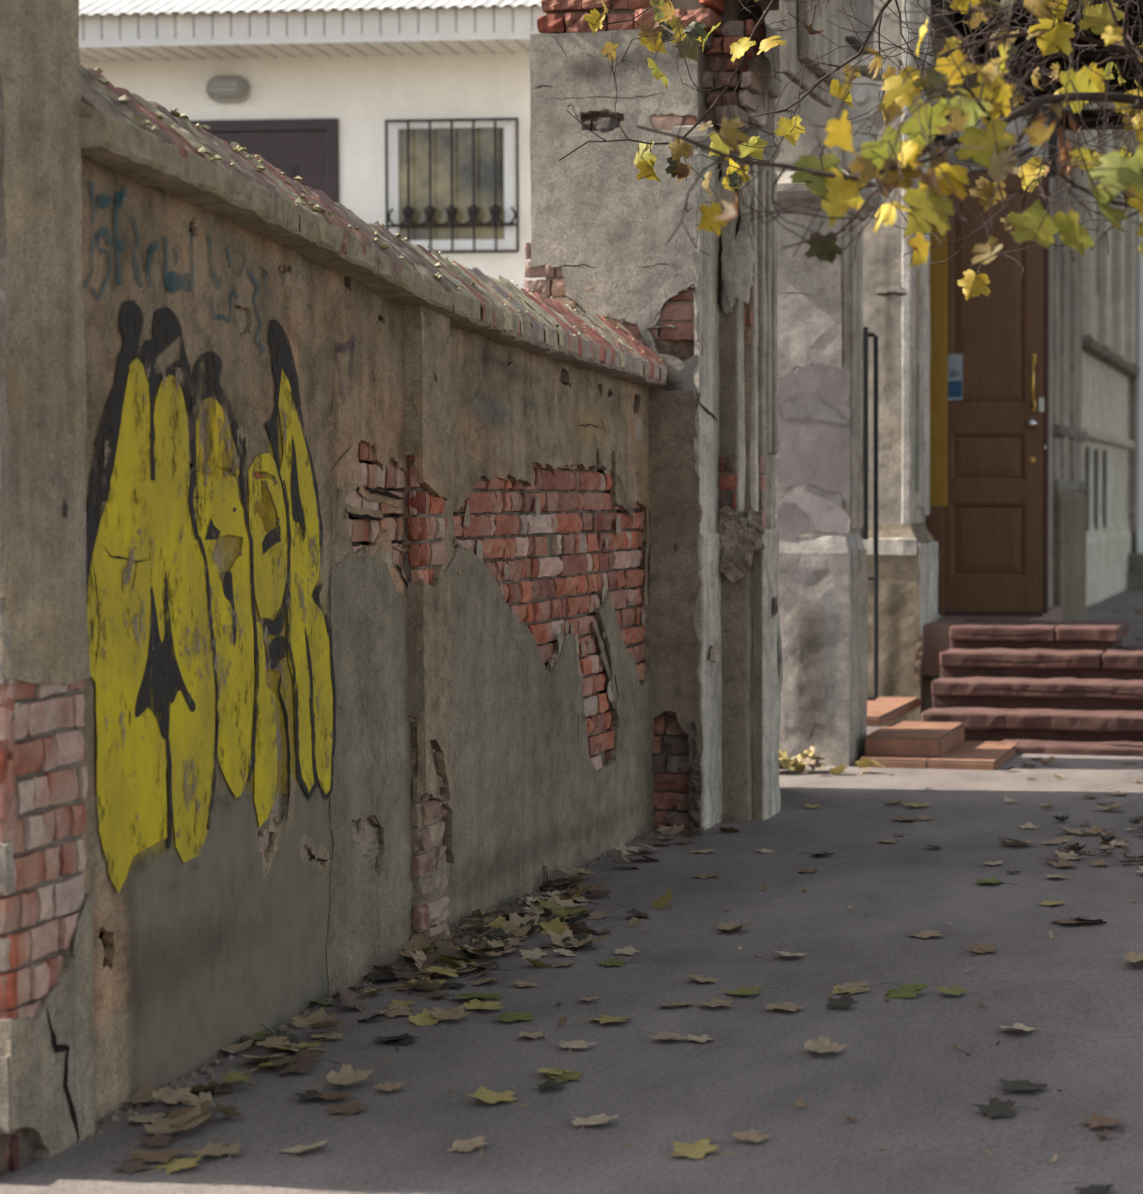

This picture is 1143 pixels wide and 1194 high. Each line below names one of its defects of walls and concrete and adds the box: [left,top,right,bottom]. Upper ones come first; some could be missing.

spalling [581,108,624,133]
spalling [650,0,767,130]
spalling [524,242,578,309]
spalling [596,288,703,361]
spalling [718,456,766,582]
spalling [343,441,651,770]
spalling [0,679,94,1022]
spalling [409,699,451,954]
spalling [650,711,701,830]
crack [47,1001,86,1144]